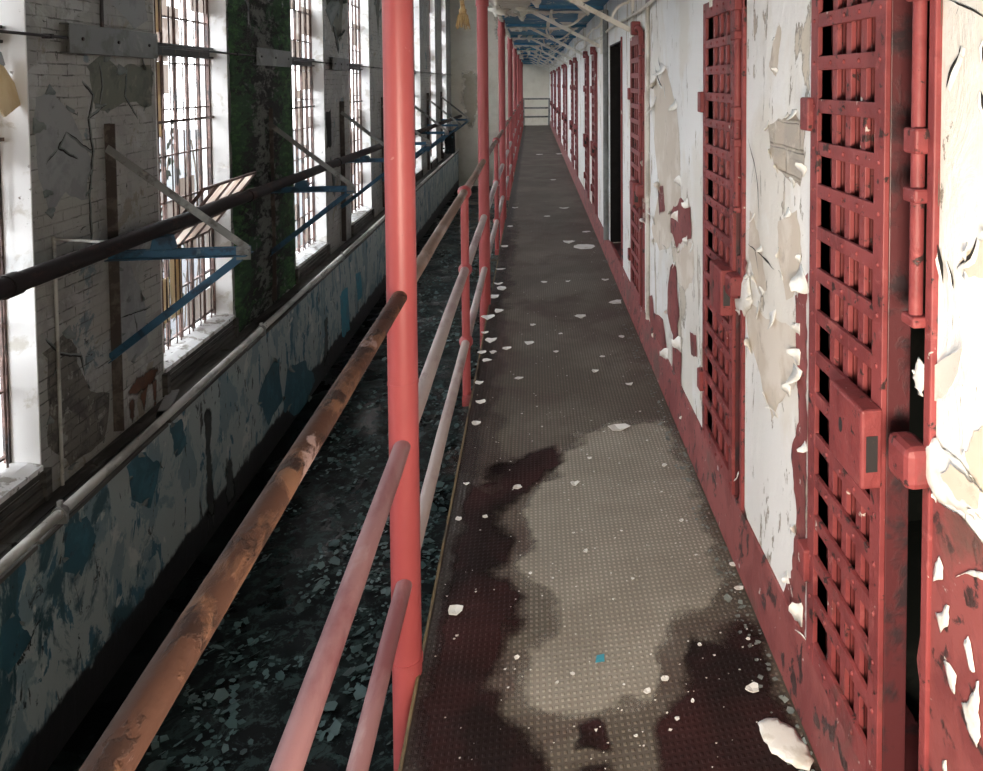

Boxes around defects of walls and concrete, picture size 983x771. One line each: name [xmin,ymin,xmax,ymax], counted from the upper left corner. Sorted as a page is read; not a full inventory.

peeling [488,0,588,61]
peeling [32,84,94,219]
peeling [639,63,697,385]
spalling [763,109,807,188]
spalling [42,325,109,470]
corrosion [128,368,158,422]
peeling [258,357,315,425]
peeling [735,207,809,640]
water stain [416,446,563,771]
peeling [917,426,983,771]
water stain [576,719,611,751]
water stain [655,618,820,771]